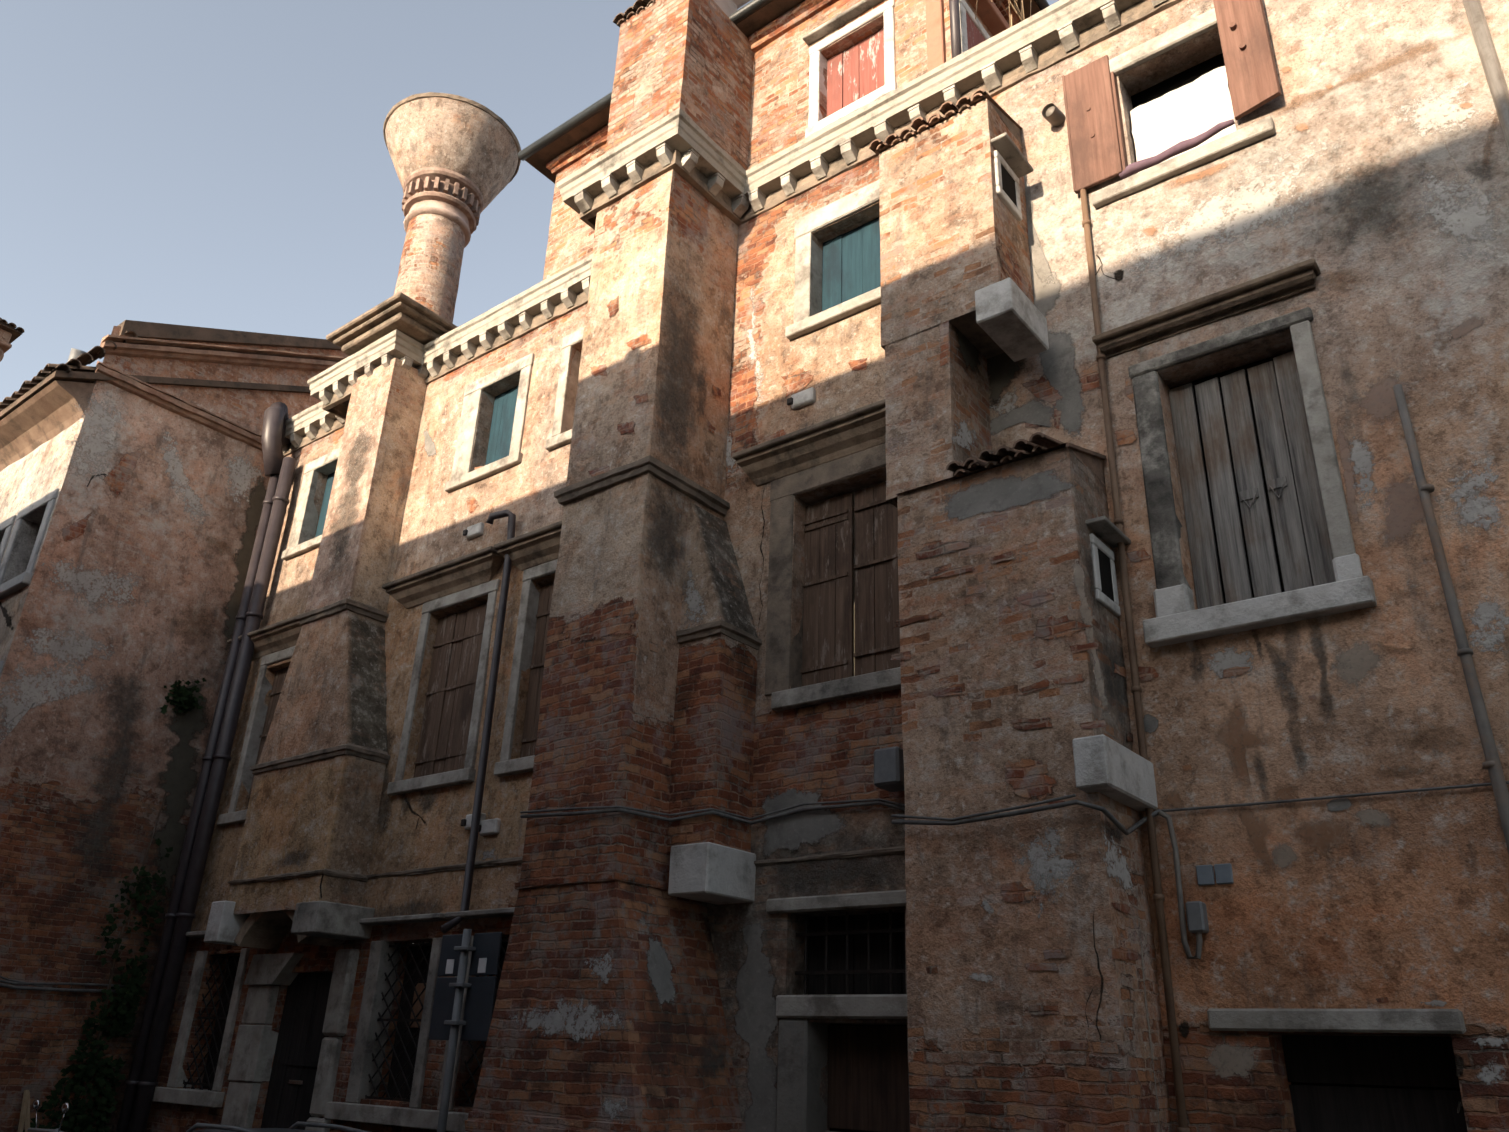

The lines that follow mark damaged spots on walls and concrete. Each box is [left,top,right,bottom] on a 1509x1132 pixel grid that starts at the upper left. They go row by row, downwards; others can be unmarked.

damp [1337,165,1401,243]
peeling [952,175,1101,451]
peeling [42,513,149,613]
peeling [0,628,114,743]
damp [1253,629,1305,767]
damp [1311,620,1332,717]
spalling [981,827,1073,918]
spalling [1103,834,1159,960]
crack [1085,913,1103,1041]